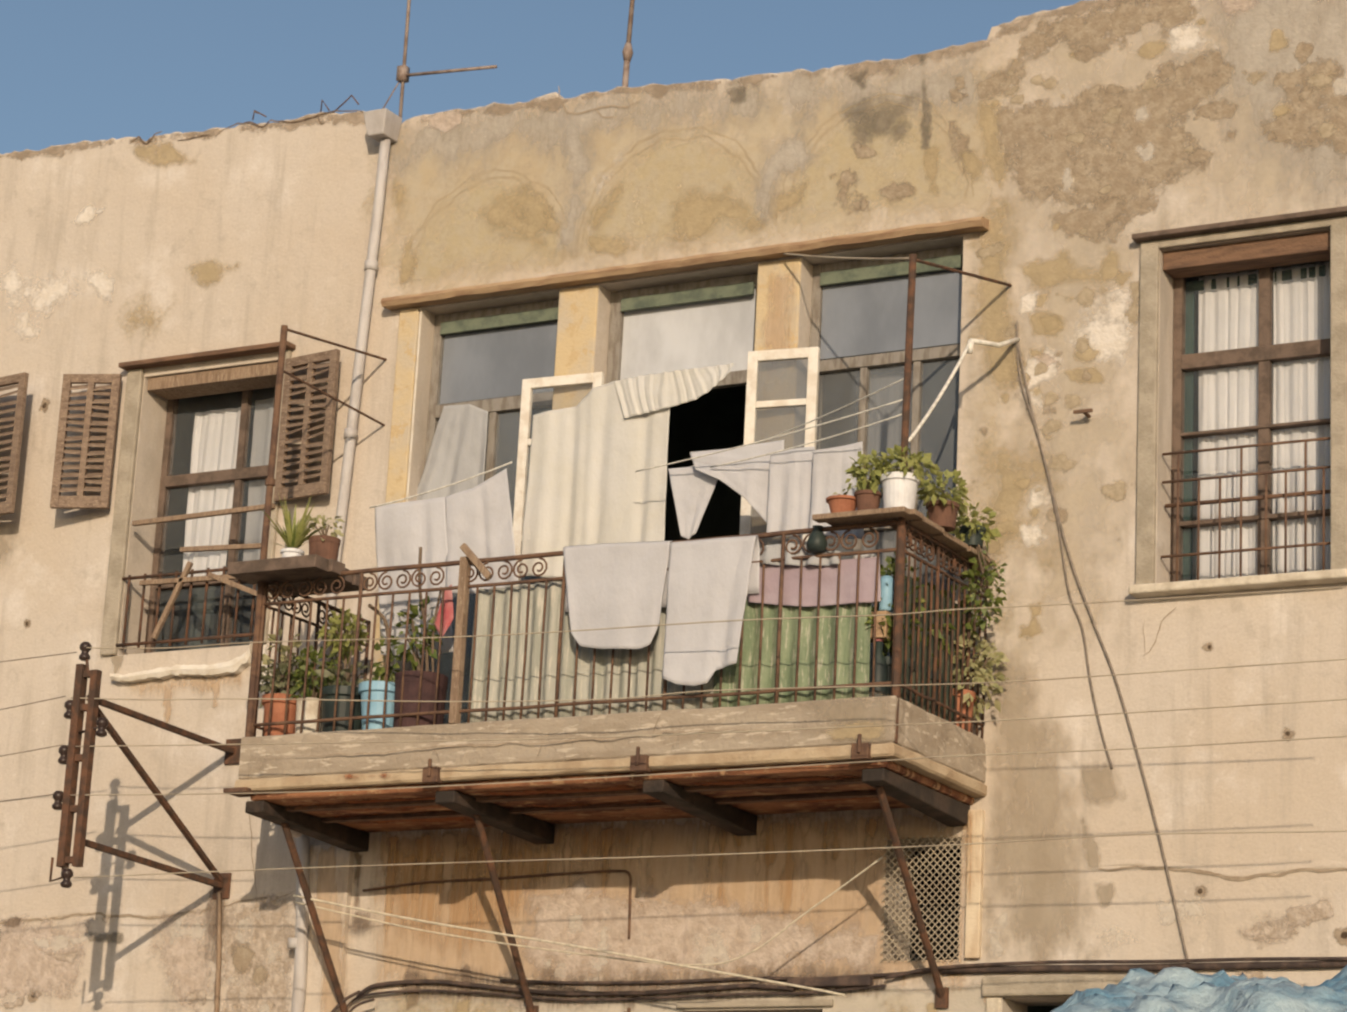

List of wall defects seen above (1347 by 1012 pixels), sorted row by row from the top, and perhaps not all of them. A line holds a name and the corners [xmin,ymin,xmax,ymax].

leakage [135,143,184,165]
peeling [837,143,915,210]
flaking render [949,0,1347,445]
leakage [192,261,222,284]
peeling [988,479,1068,553]
peeling [1101,480,1126,501]
flaking render [0,917,122,1008]